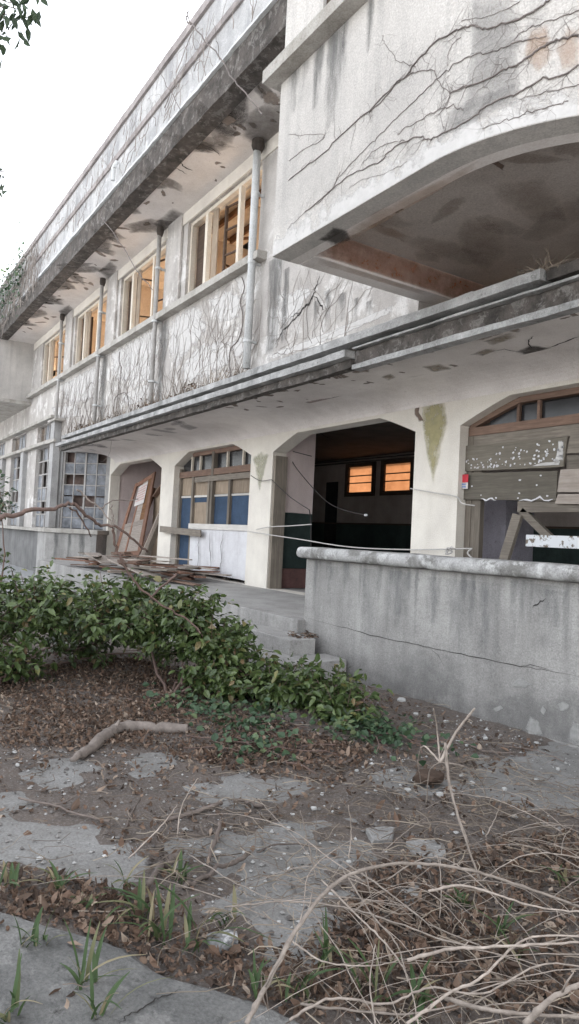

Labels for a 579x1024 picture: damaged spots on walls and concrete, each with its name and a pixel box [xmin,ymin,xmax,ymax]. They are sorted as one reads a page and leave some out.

damp [245,110,279,141]
rust [331,240,485,297]
damp [424,404,445,469]
crack [327,623,578,677]